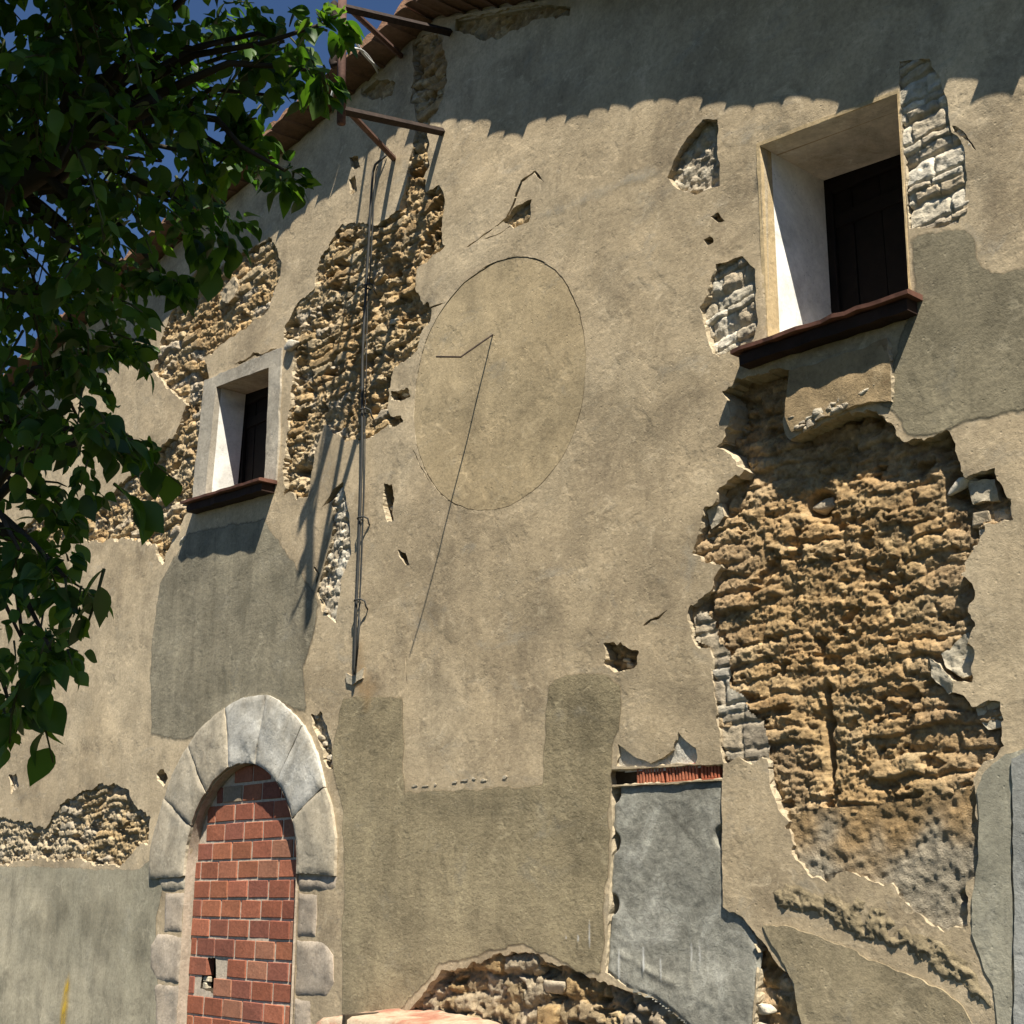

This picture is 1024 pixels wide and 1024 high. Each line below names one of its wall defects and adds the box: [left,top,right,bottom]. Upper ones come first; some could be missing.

flaking render [673,122,720,195]
flaking render [899,59,970,229]
flaking render [284,32,448,499]
flaking render [705,258,758,356]
flaking render [84,241,282,560]
flaking render [27,520,65,547]
flaking render [319,486,351,621]
flaking render [612,645,639,671]
flaking render [692,376,1013,1024]
flaking render [0,783,151,865]
flaking render [415,952,686,1024]